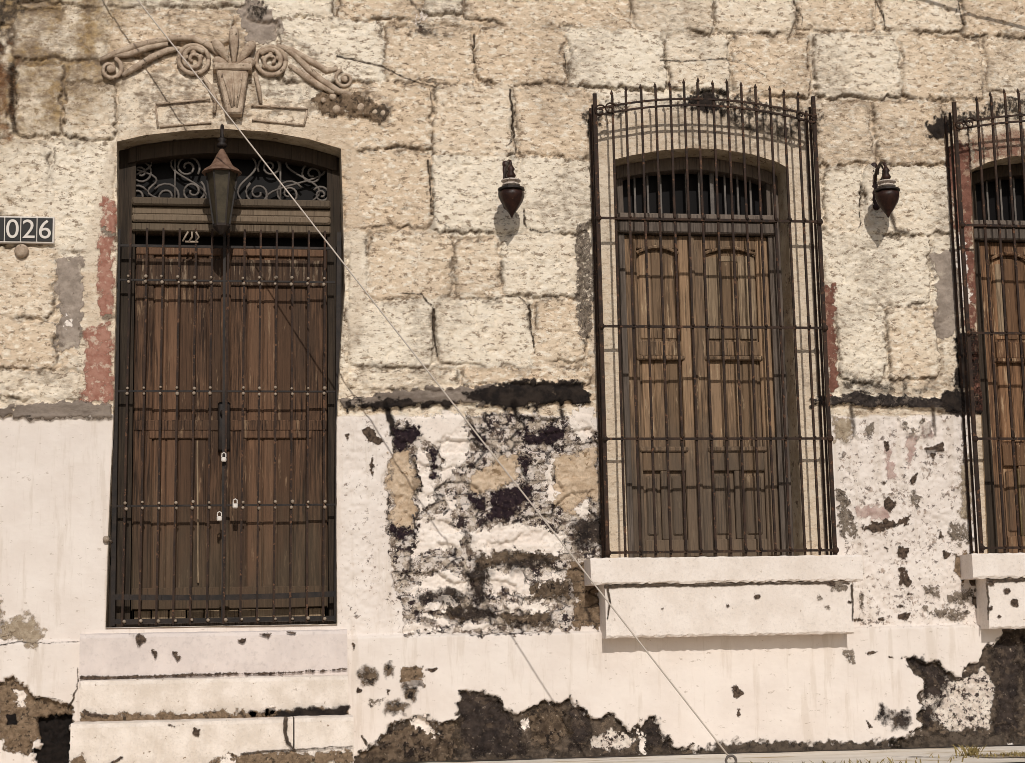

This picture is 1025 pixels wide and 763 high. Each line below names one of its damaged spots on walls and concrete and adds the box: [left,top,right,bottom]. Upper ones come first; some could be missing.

water stain [0,0,24,133]
peeling [63,196,118,403]
peeling [362,404,602,639]
peeling [832,416,853,443]
peeling [834,418,944,539]
flaking render [0,600,48,649]
peeling [135,633,157,658]
peeling [818,581,864,622]
peeling [842,649,876,664]
flaking render [884,455,1025,749]
flaking render [0,662,701,763]